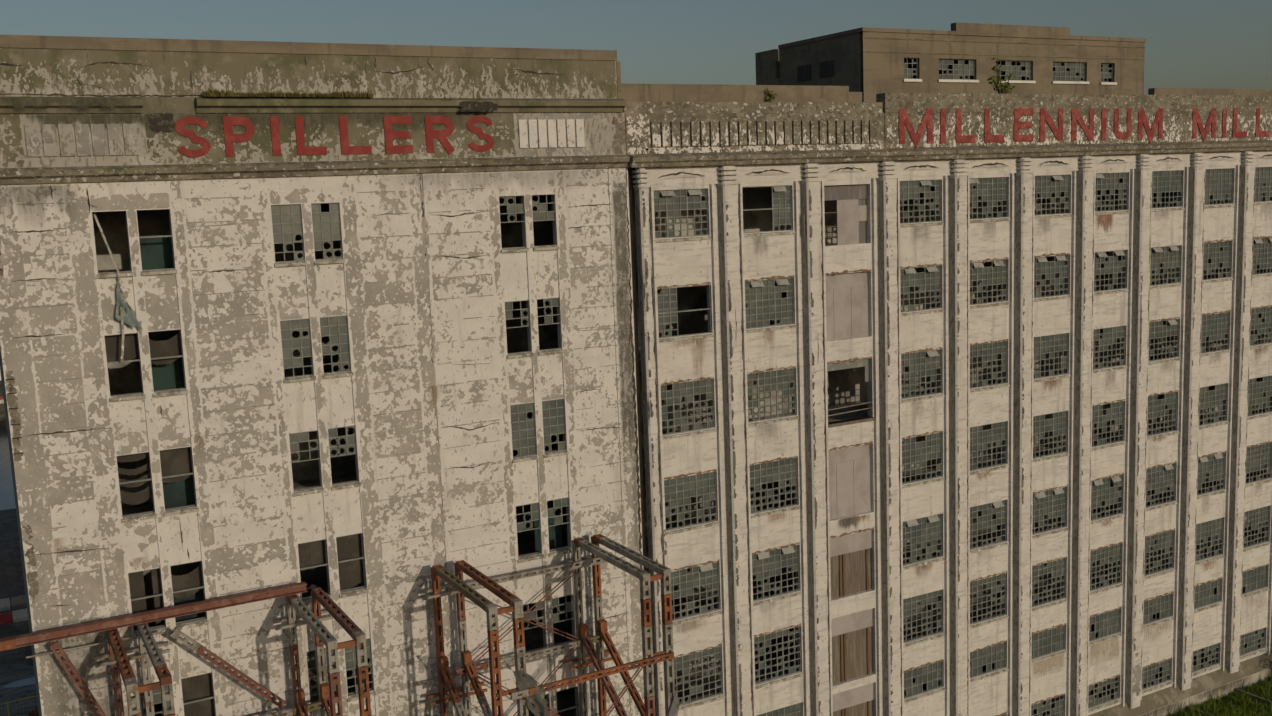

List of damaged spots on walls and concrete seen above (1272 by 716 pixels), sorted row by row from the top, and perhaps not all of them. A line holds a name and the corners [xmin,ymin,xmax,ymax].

peeling [0,168,667,716]